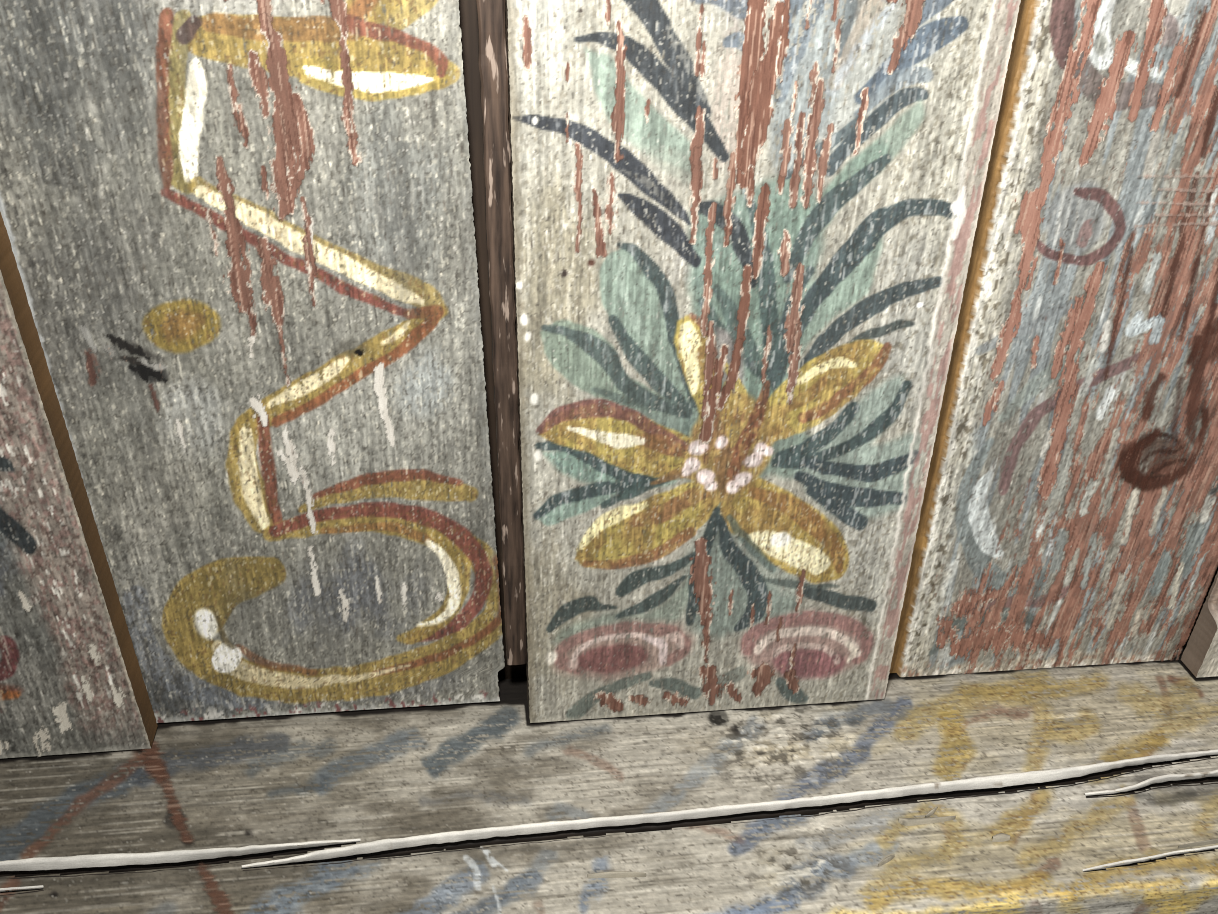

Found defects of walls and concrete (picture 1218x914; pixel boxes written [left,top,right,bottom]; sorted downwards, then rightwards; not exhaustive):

peeling [206,156,290,387]
peeling [249,395,268,426]
peeling [248,0,317,307]
peeling [320,0,362,166]
peeling [373,362,395,447]
peeling [522,15,532,71]
peeling [565,0,627,258]
peeling [689,0,841,444]
peeling [887,0,925,75]
peeling [936,0,1218,674]
peeling [276,426,321,596]
crack [0,749,1218,896]